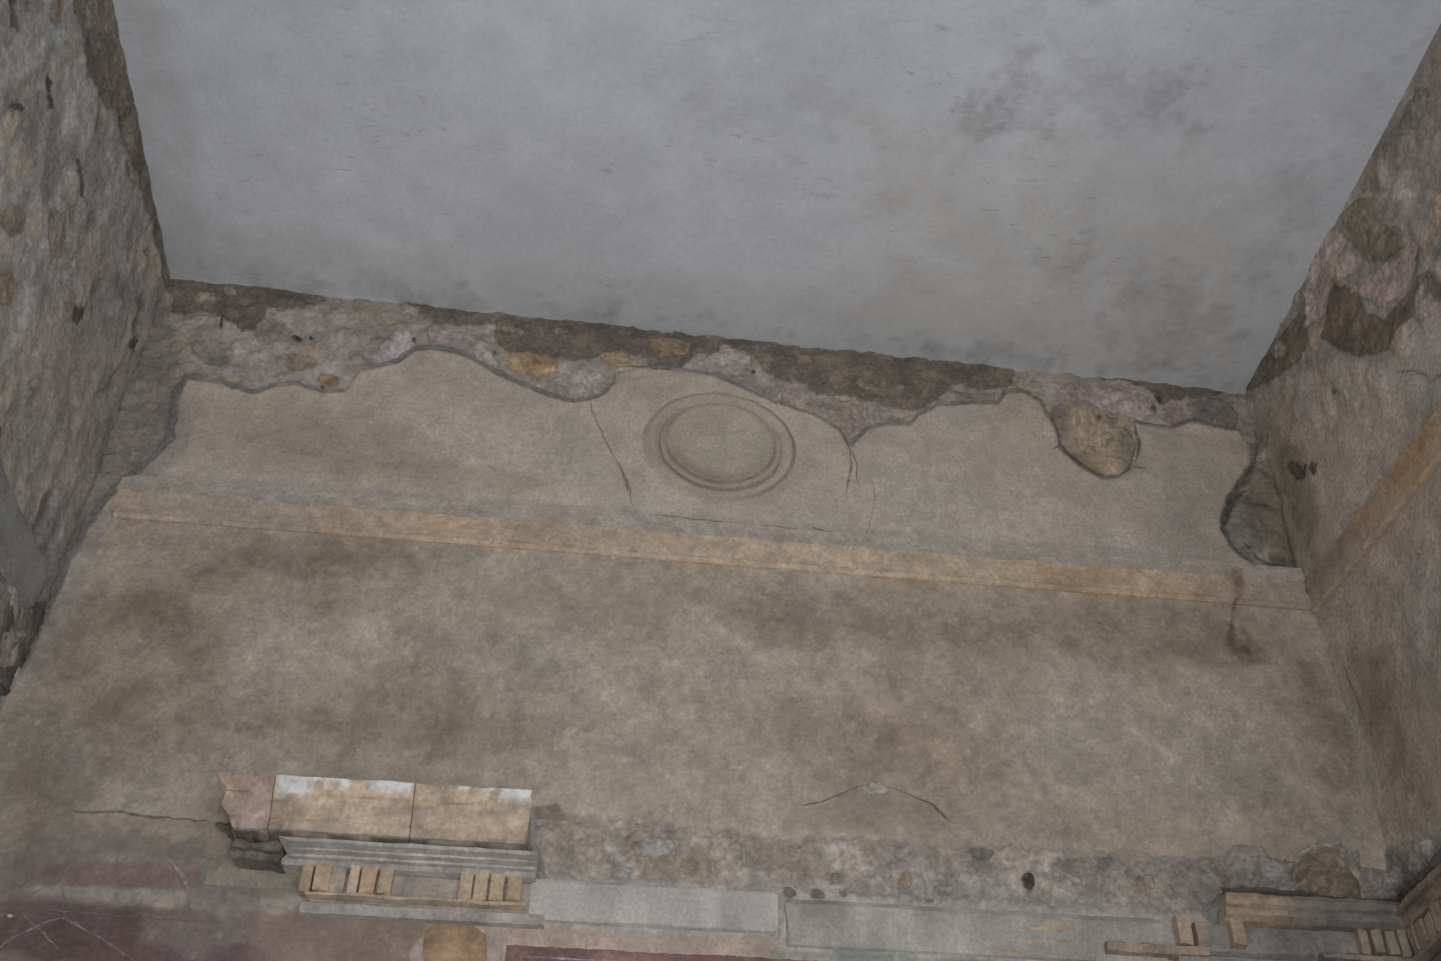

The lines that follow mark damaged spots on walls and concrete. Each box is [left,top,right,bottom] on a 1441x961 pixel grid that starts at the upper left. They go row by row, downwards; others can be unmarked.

spalling [46,73,54,109]
spalling [61,0,1441,564]
crack [590,401,828,532]
crack [636,365,1082,529]
flaking render [0,572,48,696]
crack [801,784,954,824]
spalling [784,887,846,899]
spalling [1022,873,1035,890]